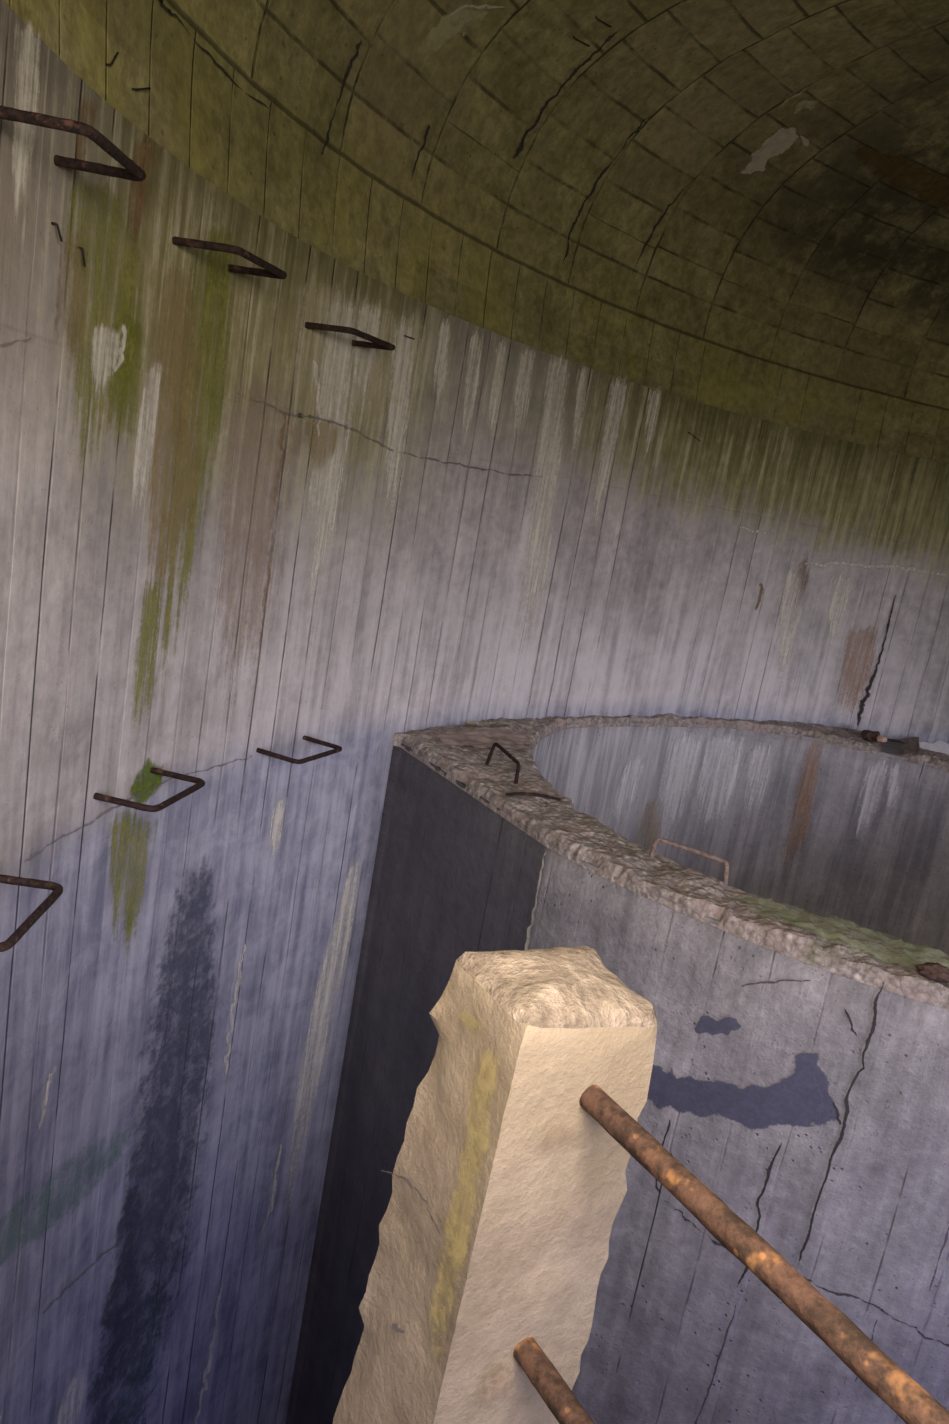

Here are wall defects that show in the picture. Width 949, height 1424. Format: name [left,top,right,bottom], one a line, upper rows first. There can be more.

crack [513,28,621,159]
peeling [740,86,817,174]
water stain [68,185,232,717]
water stain [293,287,450,591]
water stain [463,334,586,617]
crack [857,596,896,726]
water stain [57,866,246,1424]
crack [655,1180,748,1424]
water stain [695,1016,741,1035]
water stain [647,1053,837,1129]
crack [755,1143,782,1232]
crack [798,983,949,1347]